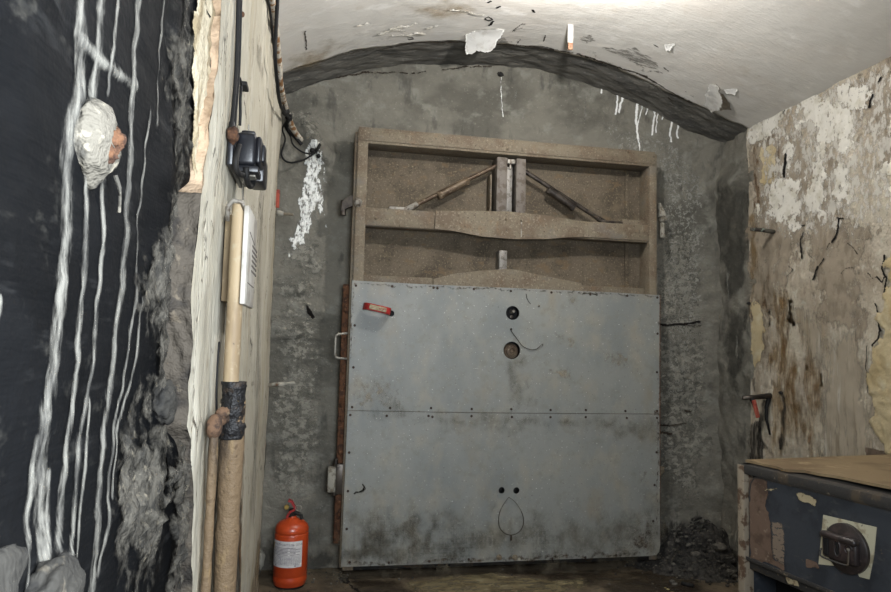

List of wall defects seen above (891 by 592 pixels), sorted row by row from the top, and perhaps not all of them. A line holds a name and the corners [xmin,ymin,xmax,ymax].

efflorescence [289,139,326,257]
peeling [465,28,522,55]
peeling [606,48,661,73]
peeling [704,84,738,113]
peeling [746,64,891,239]
damp [849,57,891,167]
damp [605,95,881,499]
peeling [750,301,766,368]
spalling [865,254,891,455]
damp [268,366,319,503]